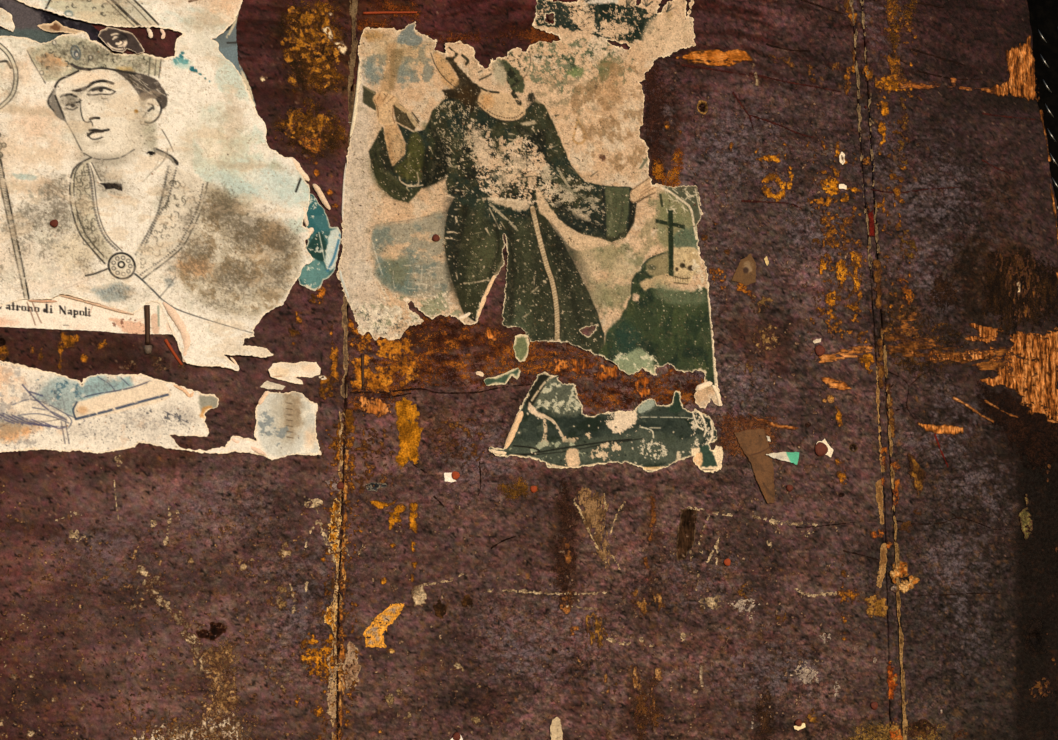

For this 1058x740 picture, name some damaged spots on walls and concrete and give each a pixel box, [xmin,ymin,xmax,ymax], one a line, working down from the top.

corrosion [274,0,427,162]
corrosion [426,25,559,47]
corrosion [340,316,708,416]
peeling [631,0,1014,740]